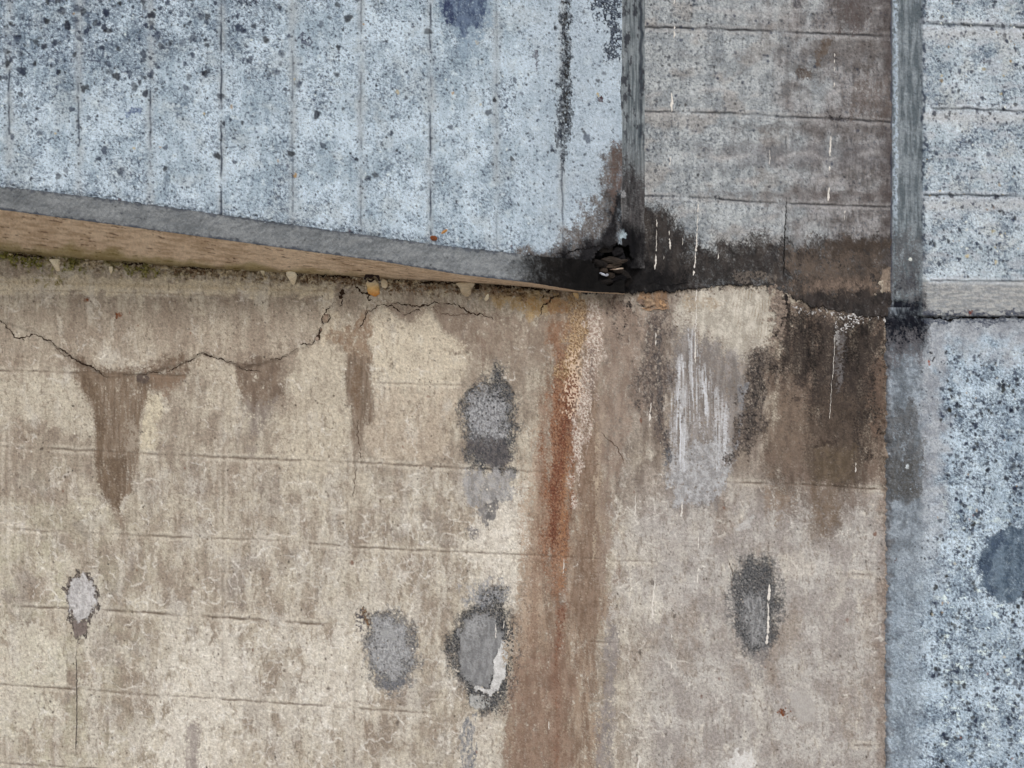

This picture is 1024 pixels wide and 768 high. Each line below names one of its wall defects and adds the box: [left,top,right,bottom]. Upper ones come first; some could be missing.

leakage [553,0,576,173]
crack [0,320,105,377]
spalling [61,568,102,643]
leakage [65,350,203,547]
leakage [231,351,289,464]
crack [144,274,561,375]
leakage [321,297,550,541]
rust [485,288,616,768]
peeling [592,246,794,466]
leakage [505,134,1024,591]
leakage [592,617,625,768]